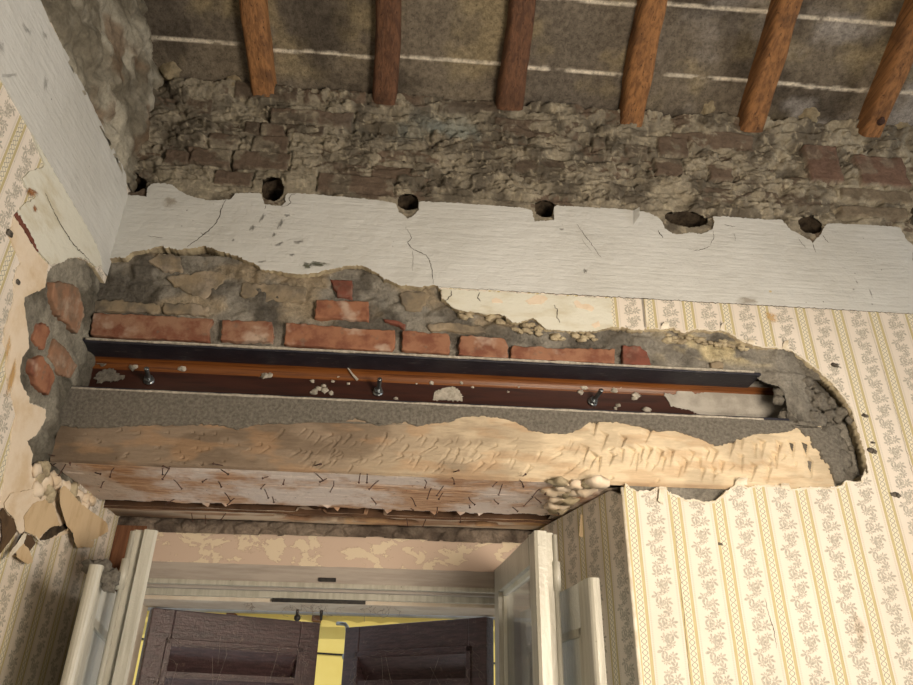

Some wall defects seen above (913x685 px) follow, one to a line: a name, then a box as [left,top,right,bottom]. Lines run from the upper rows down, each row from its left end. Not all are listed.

flaking render [41,0,913,244]
spalling [0,134,869,526]
crack [408,234,913,472]